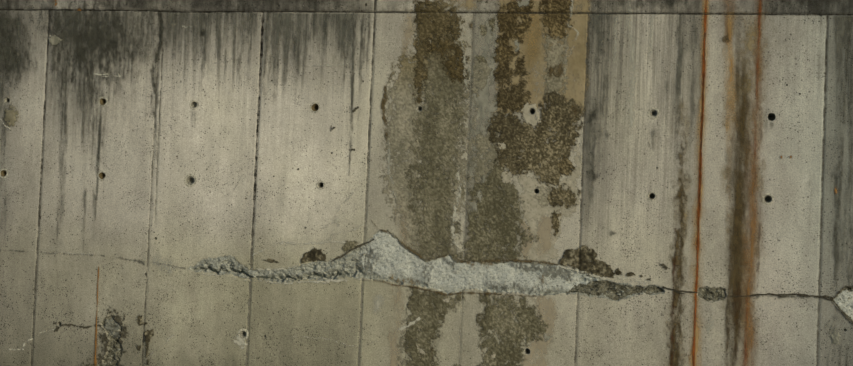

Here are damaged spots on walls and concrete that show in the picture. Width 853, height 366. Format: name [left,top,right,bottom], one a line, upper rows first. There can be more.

water stain [153,12,257,115]
water stain [265,0,356,107]
spalling [188,0,665,366]
water stain [378,0,479,263]
rust [690,0,708,366]
spalling [83,307,128,366]
peeling [136,315,154,365]
water stain [391,285,465,366]
crack [662,286,698,294]
rust [745,152,760,361]
crack [730,293,833,301]
spalling [825,286,853,324]